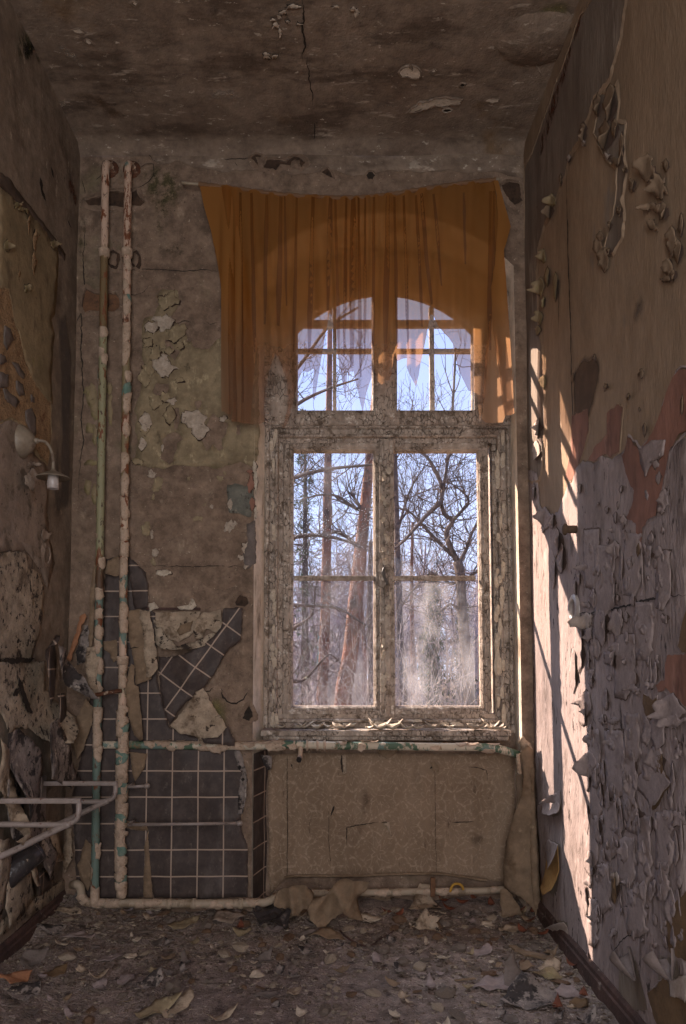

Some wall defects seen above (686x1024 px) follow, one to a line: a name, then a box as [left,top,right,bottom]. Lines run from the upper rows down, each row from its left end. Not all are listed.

spalling [247,152,336,181]
crack [301,0,315,138]
peeling [397,64,422,80]
peeling [405,81,467,114]
peeling [0,187,62,589]
peeling [77,246,277,633]
peeling [499,0,686,1024]
peeling [144,589,297,754]
peeling [297,718,464,752]
peeling [478,561,506,730]
peeling [374,888,402,898]
peeling [423,887,459,897]